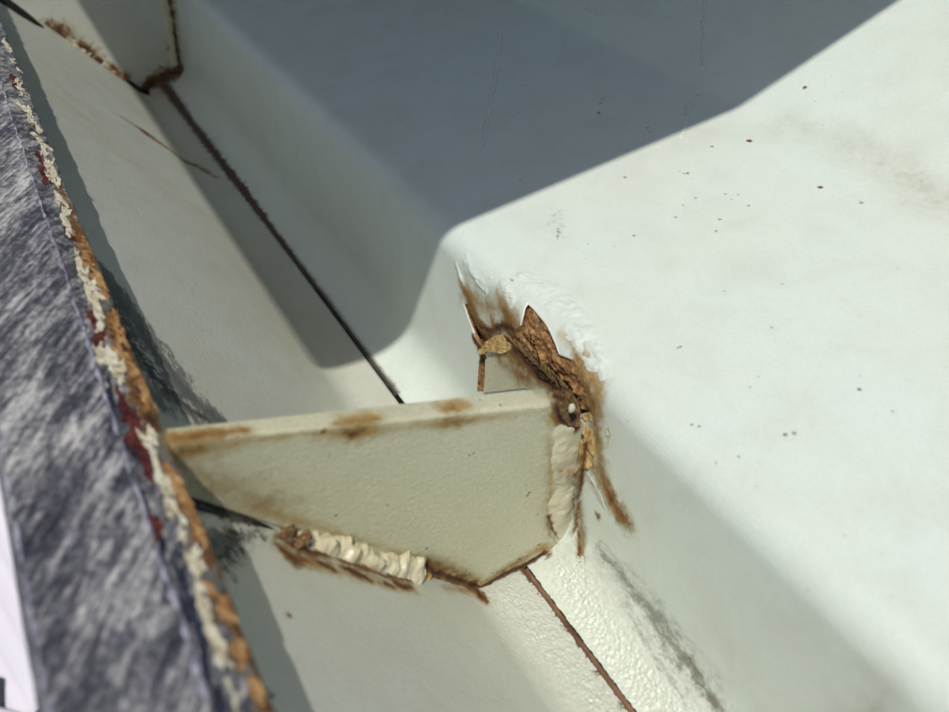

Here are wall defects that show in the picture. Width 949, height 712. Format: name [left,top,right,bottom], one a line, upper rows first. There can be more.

rust [41,18,131,82]
rust [121,0,404,404]
peeling [2,38,275,712]
rust [55,180,249,485]
rust [336,418,374,439]
rust [461,283,632,562]
rust [187,506,275,712]
rust [274,533,413,590]
rust [425,550,635,712]